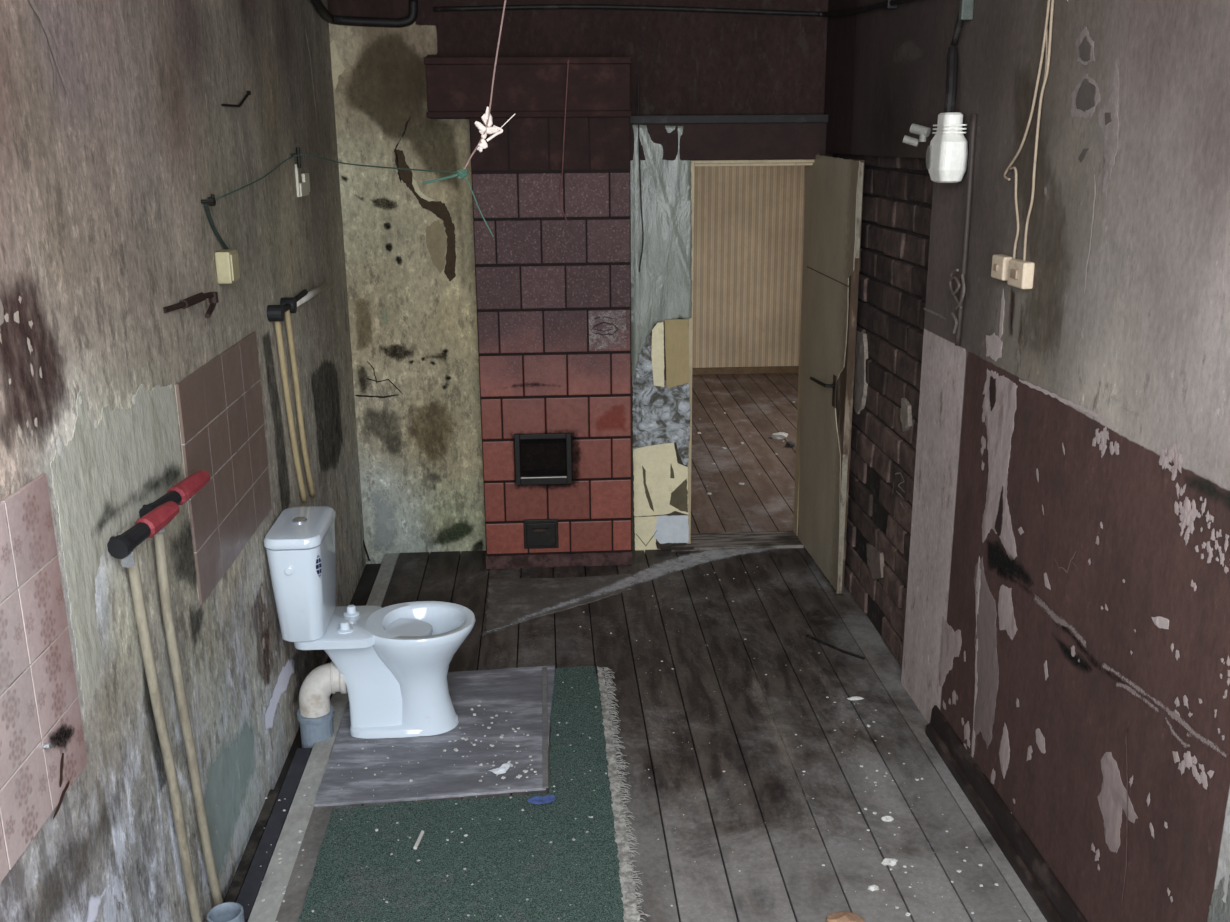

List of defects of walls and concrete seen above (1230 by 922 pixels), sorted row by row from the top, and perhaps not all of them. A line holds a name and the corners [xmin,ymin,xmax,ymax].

leakage [349,37,456,183]
crack [395,116,411,182]
leakage [0,285,63,437]
leakage [147,468,179,491]
leakage [434,523,472,543]
peeling [939,291,1024,784]
peeling [1092,426,1119,458]
peeling [1159,442,1229,574]
spalling [1035,573,1230,790]
peeling [1027,728,1046,761]
peeling [1091,752,1168,870]
flaking render [1207,875,1230,922]